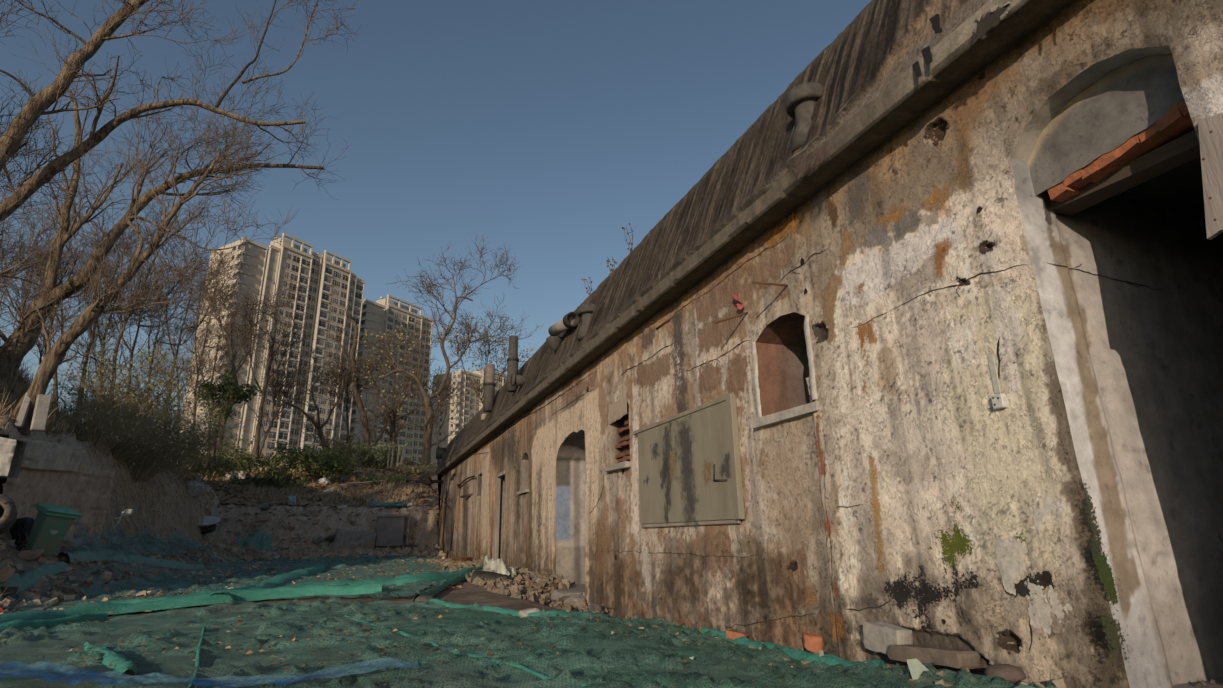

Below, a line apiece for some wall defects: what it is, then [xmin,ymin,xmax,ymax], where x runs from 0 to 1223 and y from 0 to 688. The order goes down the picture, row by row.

spalling [924,117,949,146]
crack [852,262,1158,328]
leakage [663,310,697,526]
leakage [842,563,980,632]
leakage [1002,571,1055,598]